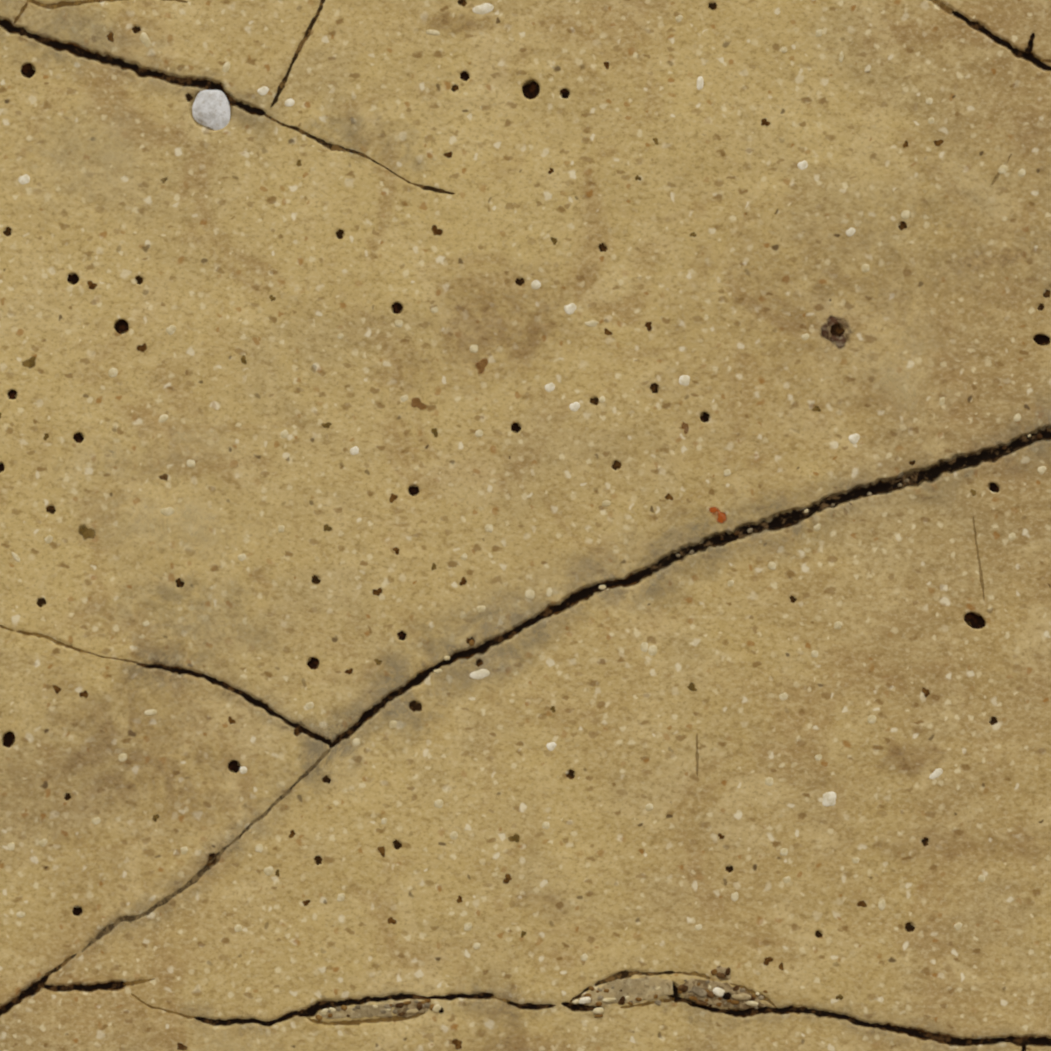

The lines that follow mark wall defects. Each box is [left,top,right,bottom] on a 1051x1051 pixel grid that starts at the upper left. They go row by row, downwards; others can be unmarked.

crack [0,0,455,195]
crack [931,0,1051,70]
crack [0,428,1051,1051]